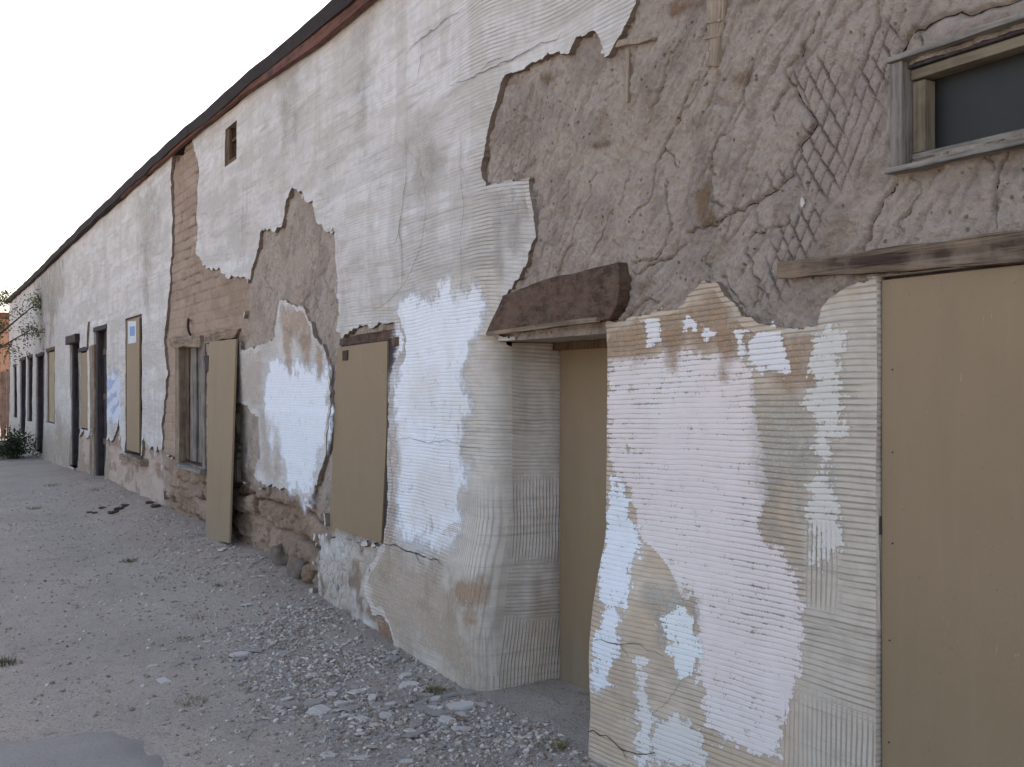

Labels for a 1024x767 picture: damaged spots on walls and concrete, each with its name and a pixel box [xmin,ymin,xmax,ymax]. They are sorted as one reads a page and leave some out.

crack [408,12,459,79]
crack [452,32,562,86]
crack [903,0,1022,52]
crack [692,30,818,233]
peeling [141,142,487,556]
flaking render [486,0,1024,767]
flaking render [312,528,393,642]
crack [380,541,442,565]
crack [596,639,662,657]
crack [588,730,655,758]